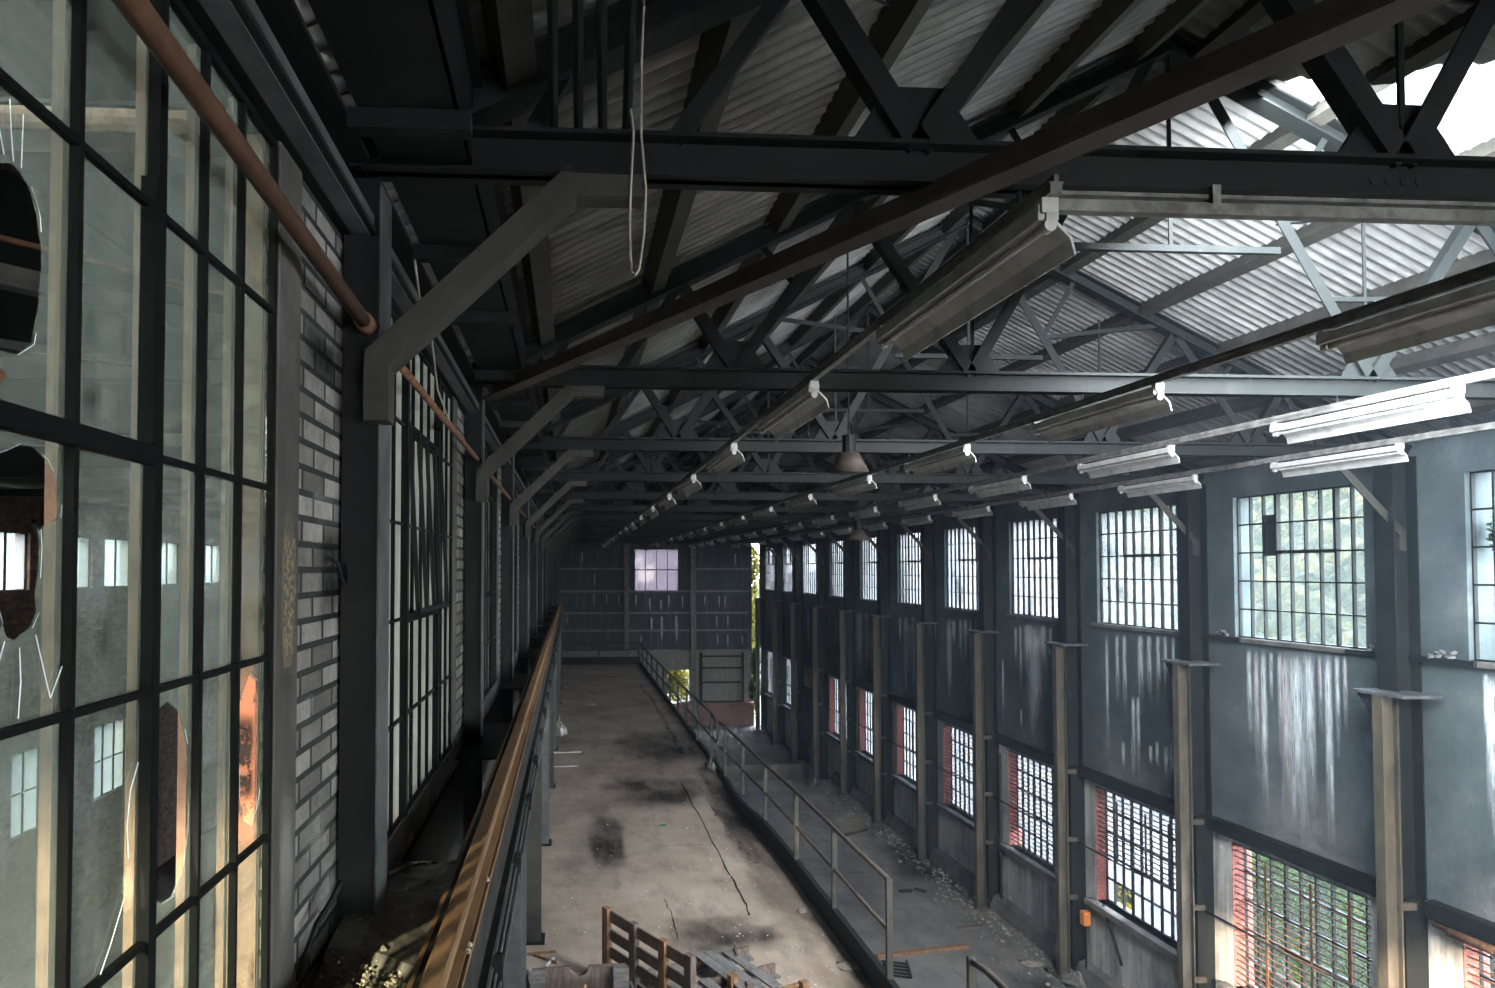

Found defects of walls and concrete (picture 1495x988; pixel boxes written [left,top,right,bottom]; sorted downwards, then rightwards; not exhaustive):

leakage [1247,654,1346,802]
leakage [1484,677,1495,782]
crack [681,783,750,915]